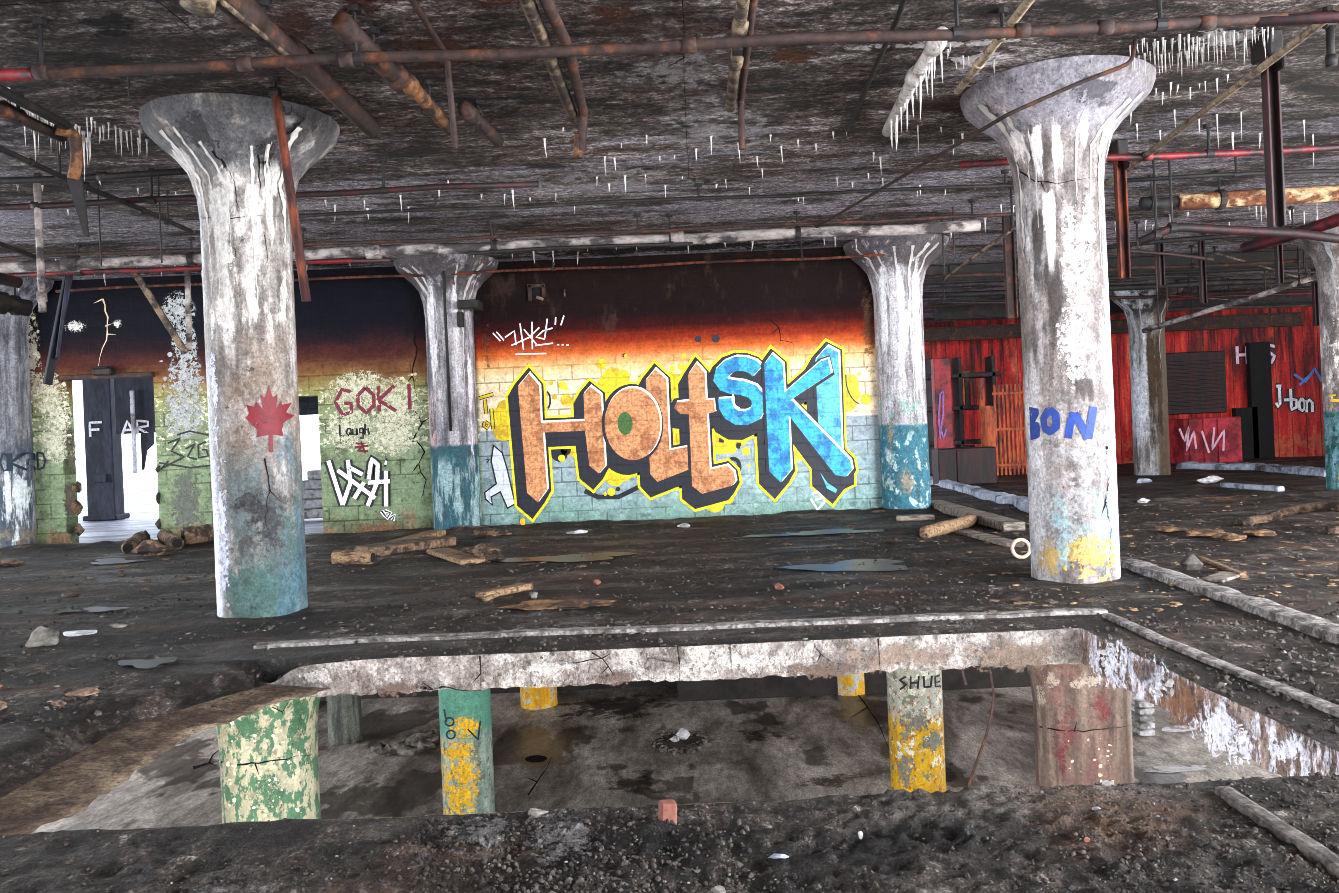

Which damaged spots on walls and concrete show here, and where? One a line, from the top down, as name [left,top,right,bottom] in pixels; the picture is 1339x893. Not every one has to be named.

rust [271,5,324,41]
rust [391,27,476,73]
water stain [844,41,925,51]
water stain [946,39,1021,70]
water stain [159,104,317,315]
water stain [978,74,1144,344]
water stain [518,240,828,258]
water stain [1075,378,1094,400]
peeling [900,710,943,754]
peeling [226,702,306,817]
peeling [445,716,482,809]
peeling [895,753,915,789]